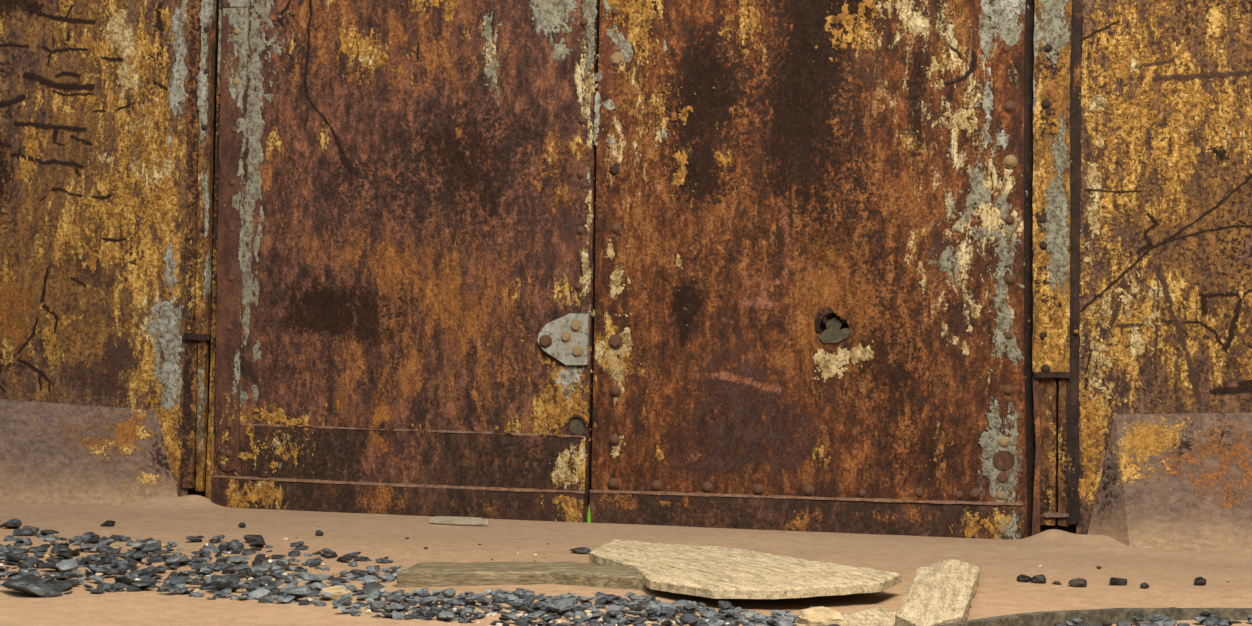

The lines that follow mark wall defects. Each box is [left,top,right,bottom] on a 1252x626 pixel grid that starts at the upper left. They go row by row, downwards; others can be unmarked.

crack [0,266,87,393]
crack [0,4,131,201]
crack [101,235,127,243]
peeling [31,0,212,485]
crack [156,2,164,31]
peeling [223,0,292,362]
rust [280,239,487,348]
peeling [485,0,697,522]
rust [671,283,704,347]
rust [671,33,744,209]
rust [762,0,964,470]
peeling [811,0,1252,500]